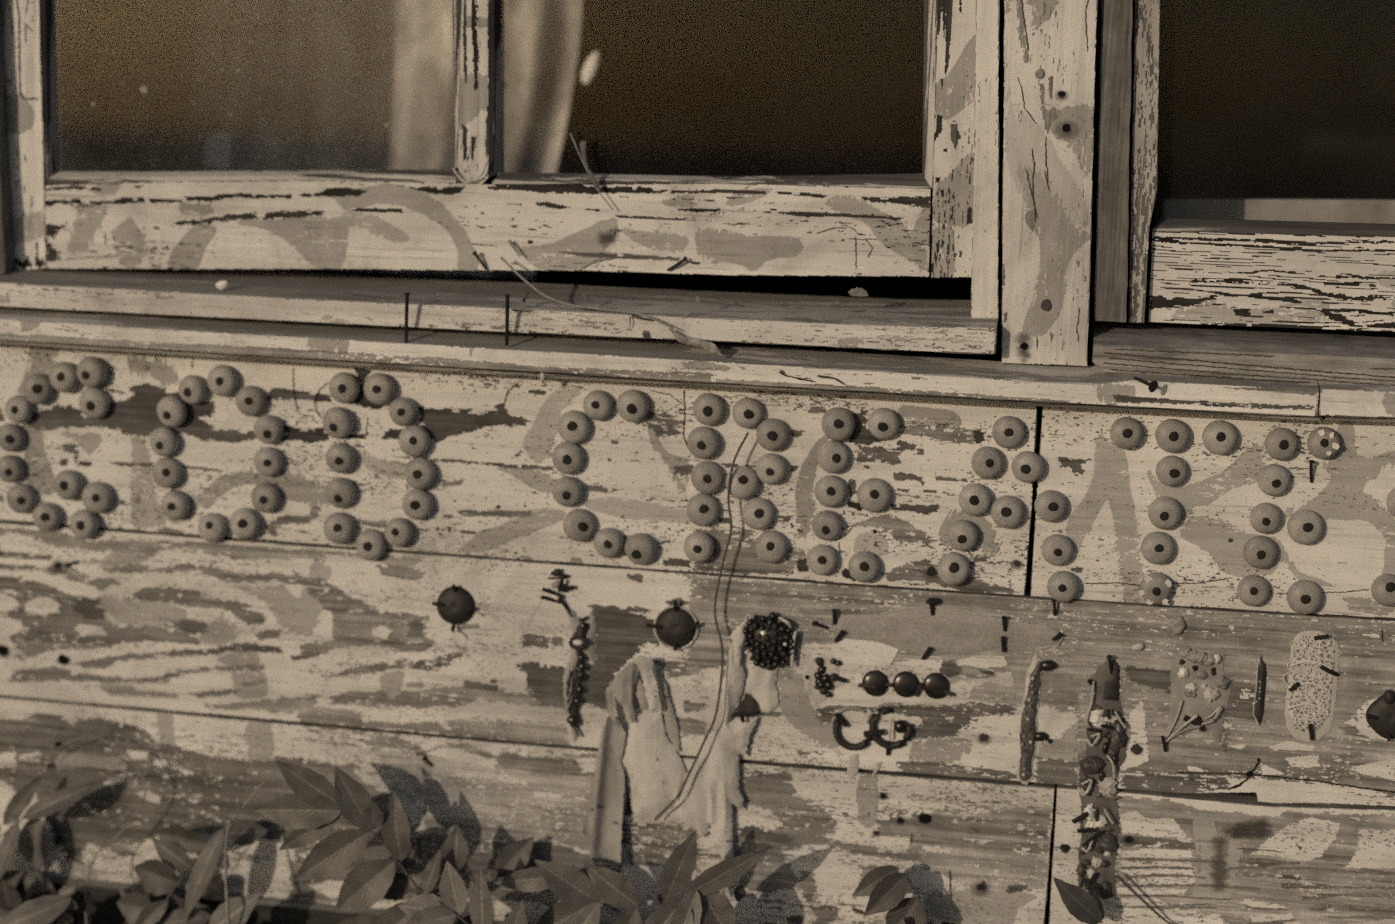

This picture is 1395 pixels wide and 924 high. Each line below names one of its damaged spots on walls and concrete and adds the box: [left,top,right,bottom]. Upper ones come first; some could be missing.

peeling [463,0,480,89]
peeling [937,0,963,89]
peeling [15,224,66,271]
peeling [45,186,404,226]
peeling [487,177,944,225]
peeling [1152,236,1395,252]
peeling [1149,269,1395,329]
peeling [0,333,1070,410]
peeling [22,383,257,468]
peeling [281,403,555,488]
peeling [0,505,703,906]
peeling [583,410,1395,924]